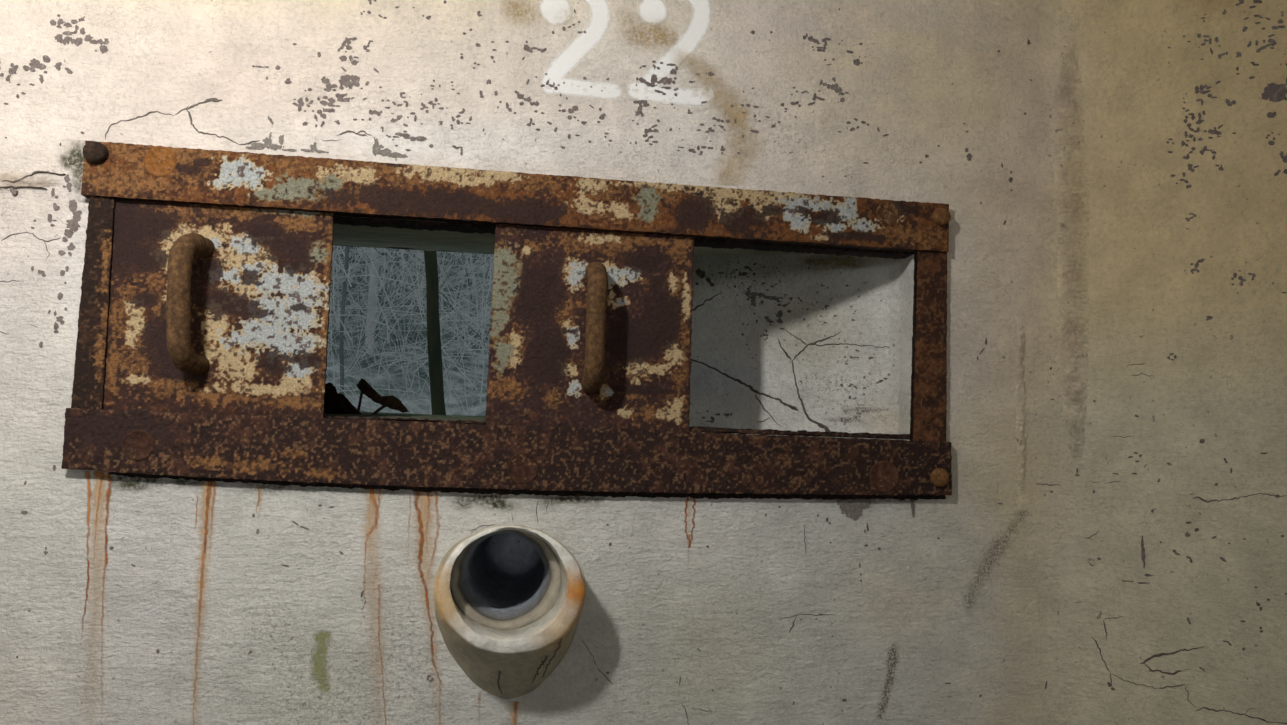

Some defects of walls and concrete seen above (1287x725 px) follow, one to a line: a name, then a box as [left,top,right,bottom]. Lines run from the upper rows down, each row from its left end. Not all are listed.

crack [0,171,66,189]
peeling [0,55,73,105]
peeling [50,14,109,54]
crack [105,98,260,145]
crack [321,130,376,144]
peeling [245,37,486,158]
peeling [630,33,866,155]
flaking render [31,174,82,348]
corrosion [82,471,111,619]
corrosion [196,481,215,653]
corrosion [415,491,455,679]
crack [1091,616,1287,724]